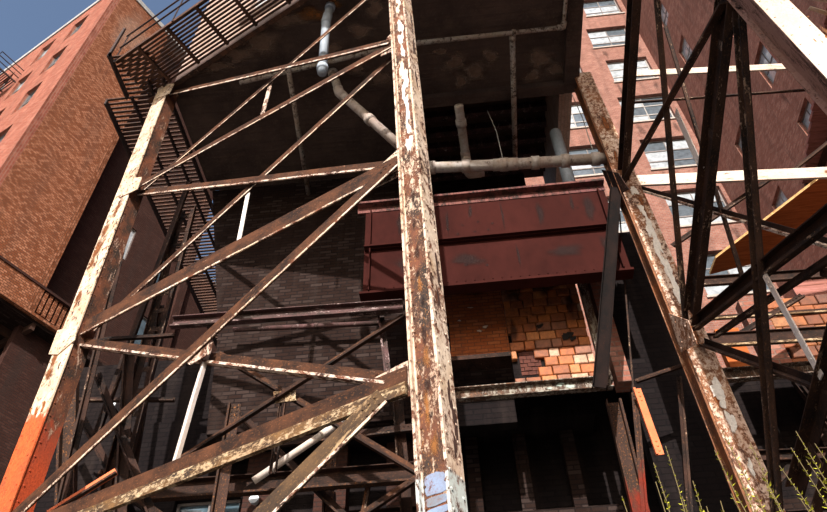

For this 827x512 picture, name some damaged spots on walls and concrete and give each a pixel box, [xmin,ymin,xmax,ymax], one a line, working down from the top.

peeling [637,205,681,304]
spalling [518,348,542,376]
peeling [30,391,53,418]
corrosion [424,380,433,421]
peeling [447,380,459,459]
peeling [710,377,737,433]